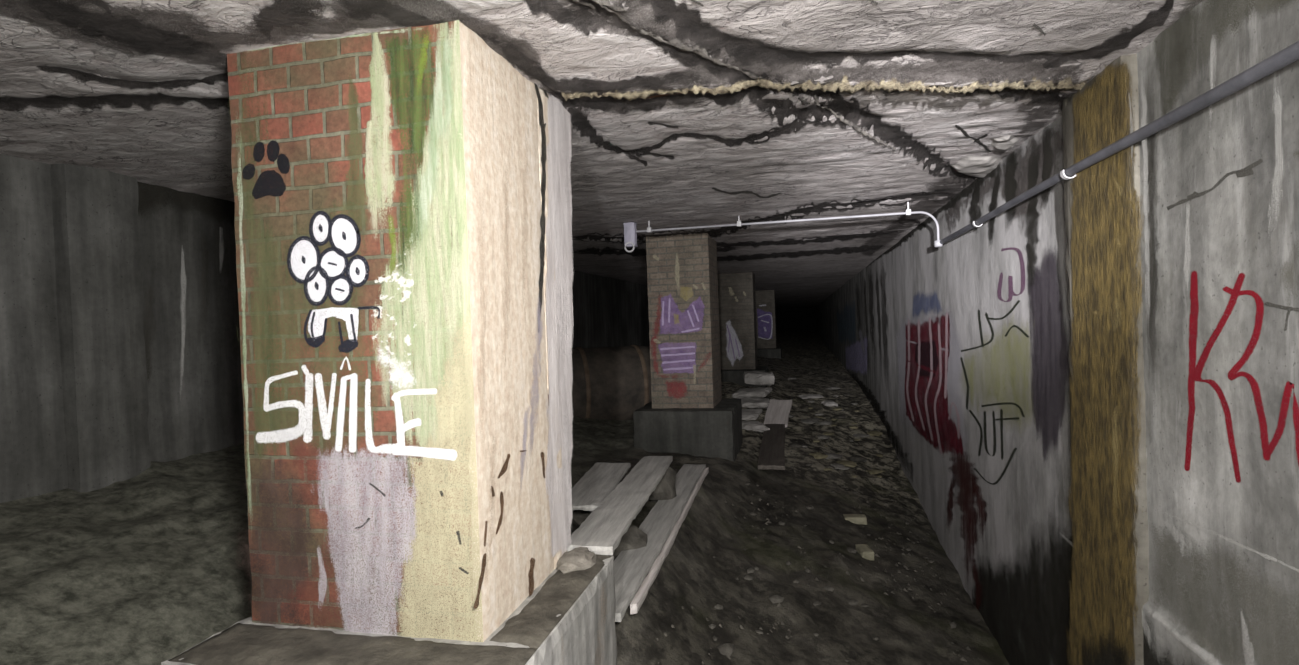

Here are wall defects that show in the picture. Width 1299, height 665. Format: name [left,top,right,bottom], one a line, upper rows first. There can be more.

peeling [371,20,574,642]
crack [522,0,1174,333]
damp [1125,0,1299,414]
crack [1167,159,1263,210]
damp [969,507,1299,665]